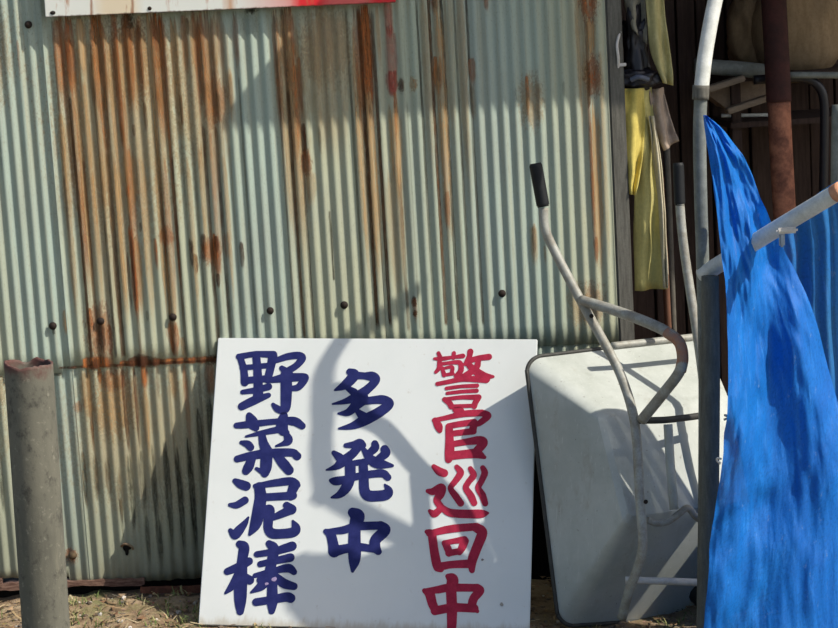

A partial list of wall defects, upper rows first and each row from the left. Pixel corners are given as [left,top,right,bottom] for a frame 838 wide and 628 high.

corrosion [54,13,232,444]
corrosion [274,7,315,338]
corrosion [352,5,391,325]
corrosion [580,0,603,250]
water stain [82,452,107,501]
water stain [144,409,204,553]